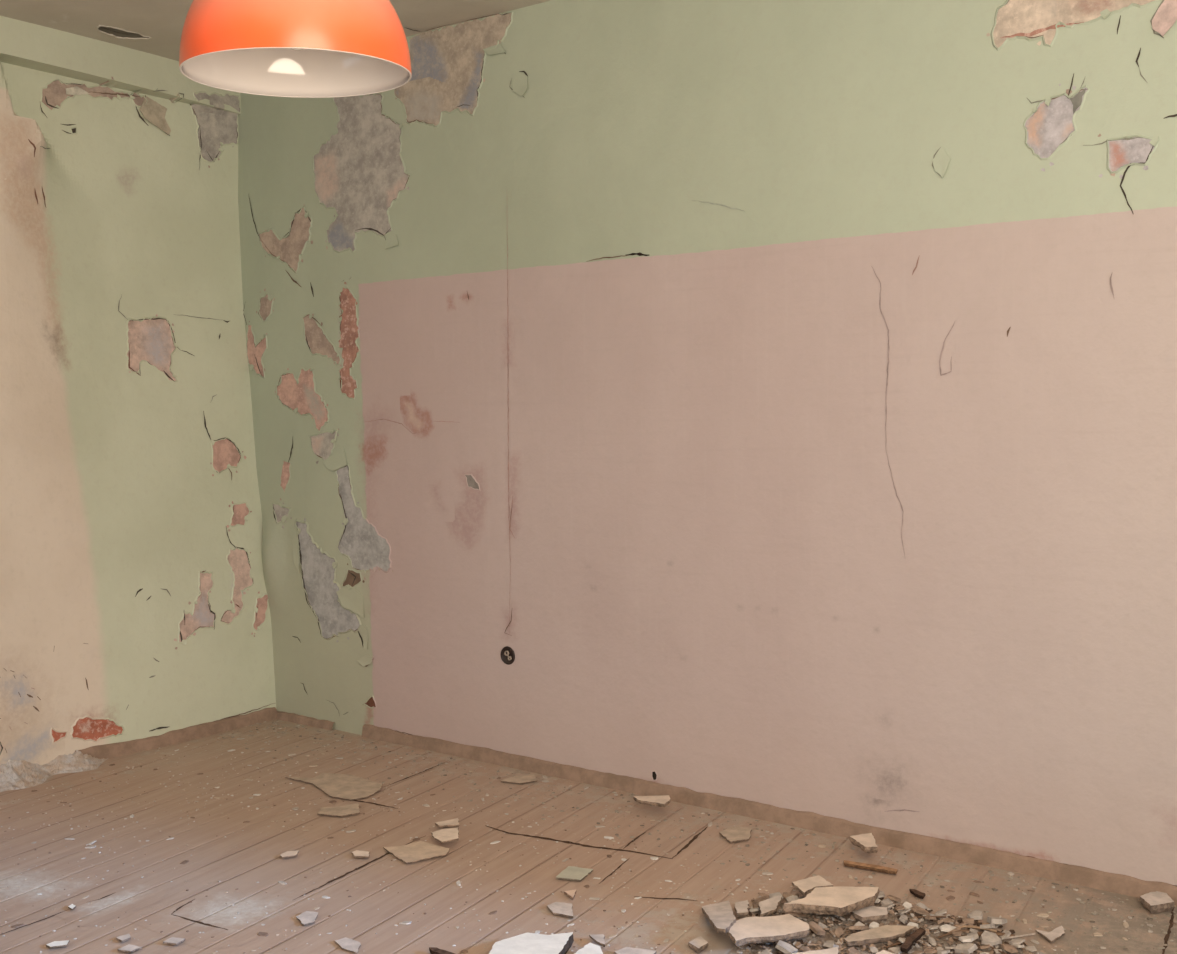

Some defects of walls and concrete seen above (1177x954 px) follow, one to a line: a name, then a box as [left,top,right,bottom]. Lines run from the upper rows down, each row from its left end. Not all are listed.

peeling [986,0,1177,51]
flaking render [0,77,241,385]
peeling [248,12,513,287]
peeling [1022,74,1090,172]
peeling [1083,134,1159,213]
peeling [203,395,247,481]
peeling [243,288,275,378]
peeling [275,280,360,433]
crack [871,266,905,555]
peeling [174,501,269,649]
peeling [292,447,393,650]
peeling [0,596,136,755]